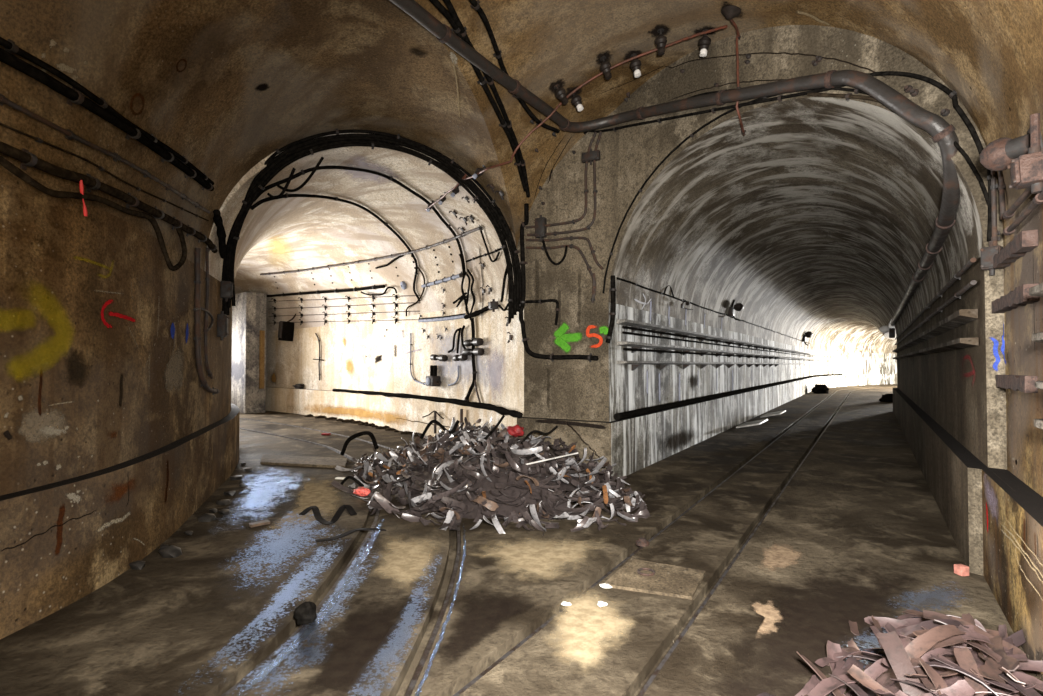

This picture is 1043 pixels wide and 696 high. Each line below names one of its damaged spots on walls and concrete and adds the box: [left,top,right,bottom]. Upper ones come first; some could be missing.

crack [2,510,96,551]
water stain [303,596,417,696]